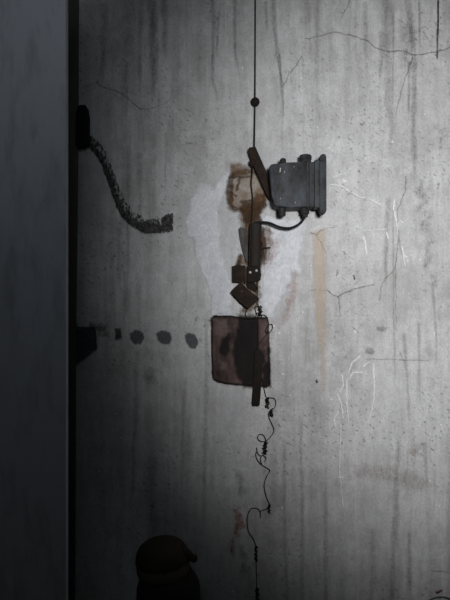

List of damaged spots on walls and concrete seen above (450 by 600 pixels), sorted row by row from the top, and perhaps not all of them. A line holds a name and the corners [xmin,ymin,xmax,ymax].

rust [211,192,271,388]